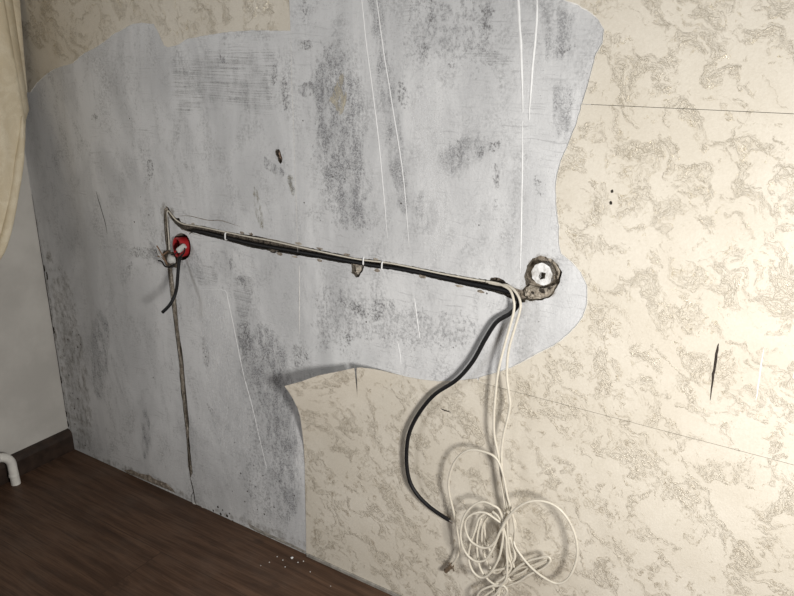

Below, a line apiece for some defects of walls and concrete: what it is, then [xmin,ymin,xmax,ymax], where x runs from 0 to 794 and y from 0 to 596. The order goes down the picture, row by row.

peeling [25,0,604,554]